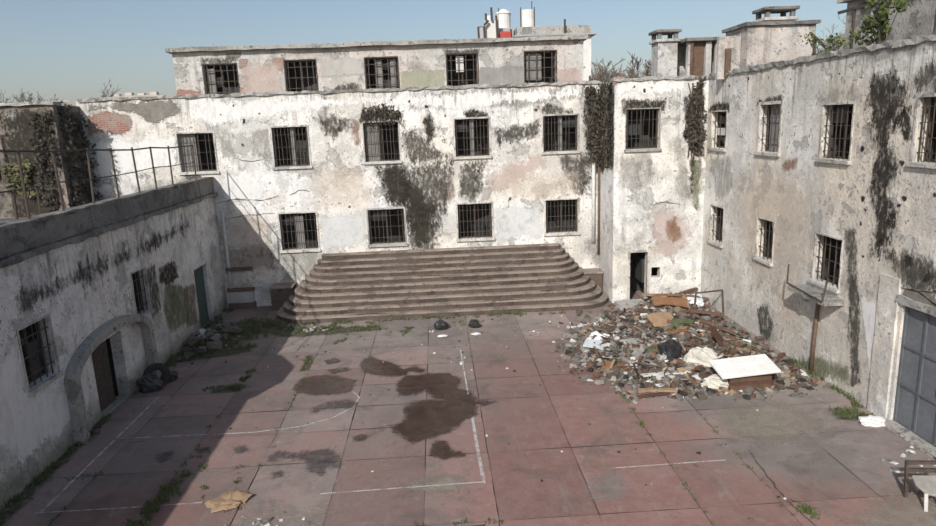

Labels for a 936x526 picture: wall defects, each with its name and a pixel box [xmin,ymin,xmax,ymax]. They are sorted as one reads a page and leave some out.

spalling [87,89,200,136]
leakage [319,108,488,250]
leakage [494,82,666,195]
leakage [682,79,730,193]
leakage [860,59,936,296]
leakage [846,222,862,387]